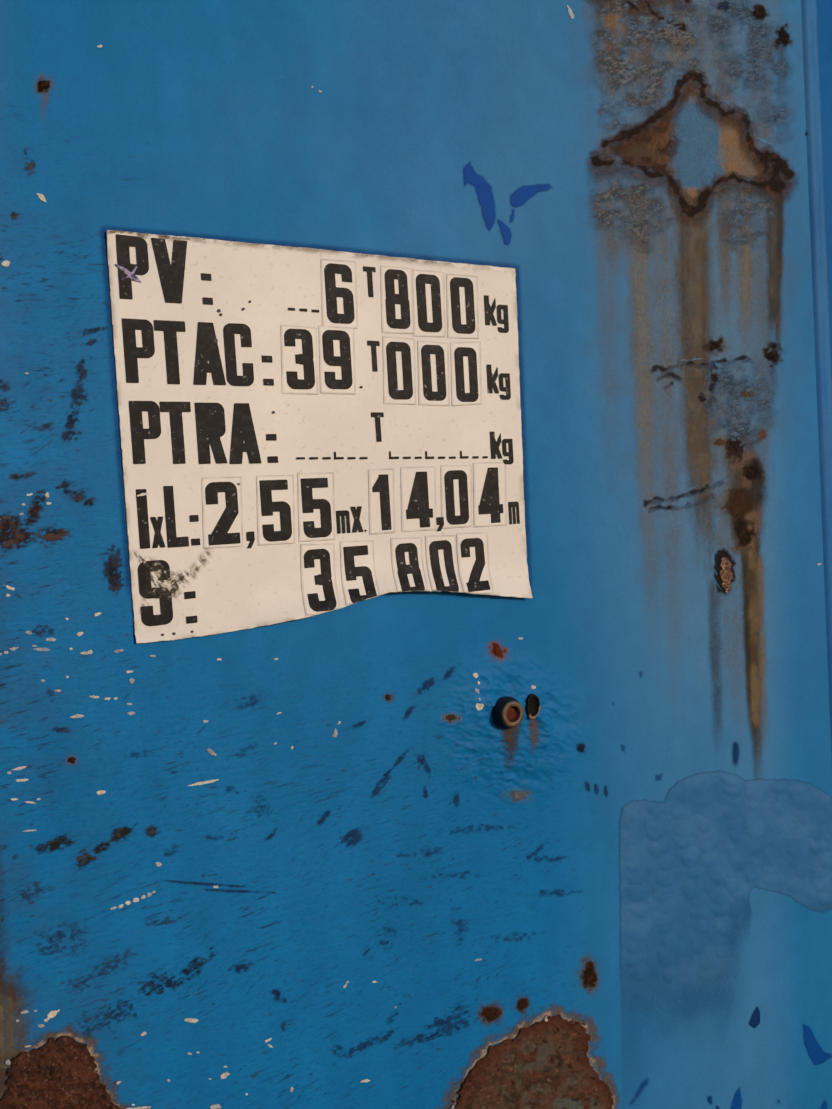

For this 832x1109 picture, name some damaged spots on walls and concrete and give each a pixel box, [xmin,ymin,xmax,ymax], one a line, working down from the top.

rust [717,0,731,12]
rust [753,3,768,23]
rust [601,0,651,72]
rust [774,24,792,49]
rust [612,83,784,755]
rust [503,720,538,753]
rust [580,958,598,991]
rust [0,973,151,1109]
rust [444,998,618,1109]